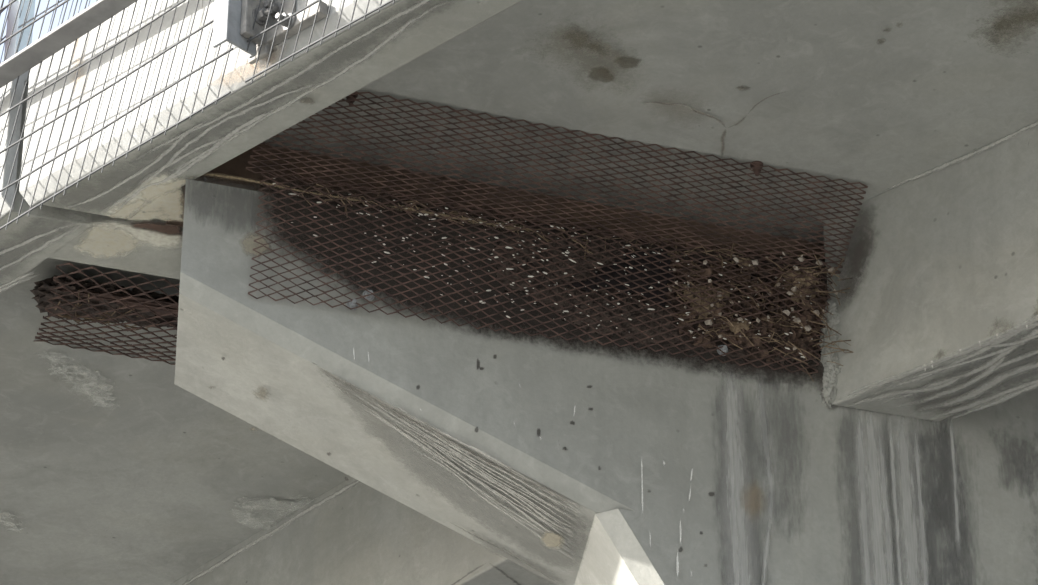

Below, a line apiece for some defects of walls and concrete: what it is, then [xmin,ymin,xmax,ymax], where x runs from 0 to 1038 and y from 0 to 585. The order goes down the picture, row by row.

damp [77,0,430,258]
damp [568,33,638,82]
damp [0,224,76,271]
damp [326,372,571,538]
damp [726,372,769,585]
damp [858,416,927,585]
damp [850,312,1038,543]